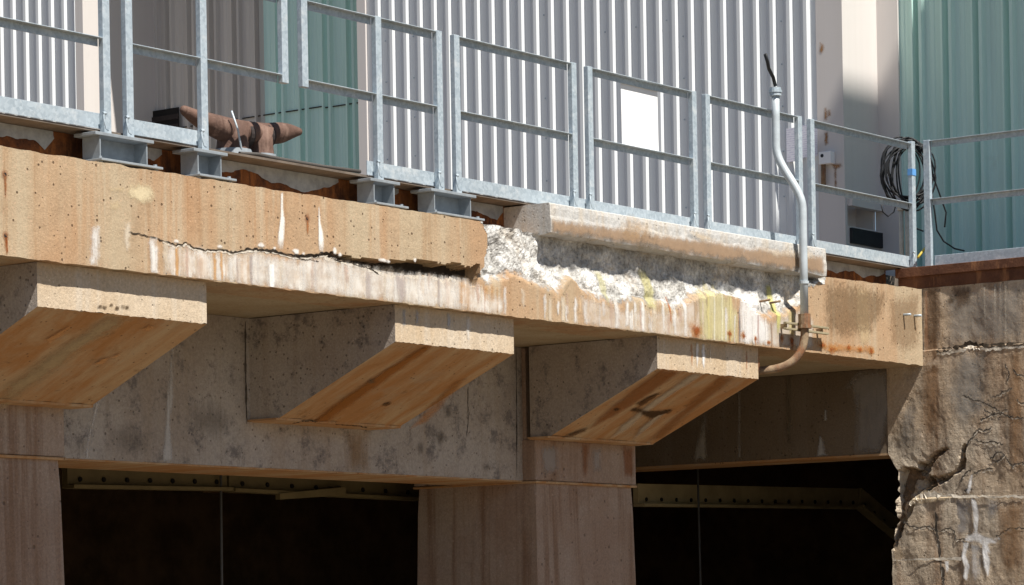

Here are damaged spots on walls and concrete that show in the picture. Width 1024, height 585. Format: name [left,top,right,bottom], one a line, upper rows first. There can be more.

crack [131,232,466,289]
damp [150,211,506,337]
spalling [471,201,885,317]
rust [821,343,874,353]
crack [936,340,1024,493]
crack [905,512,966,585]
damp [957,475,999,580]